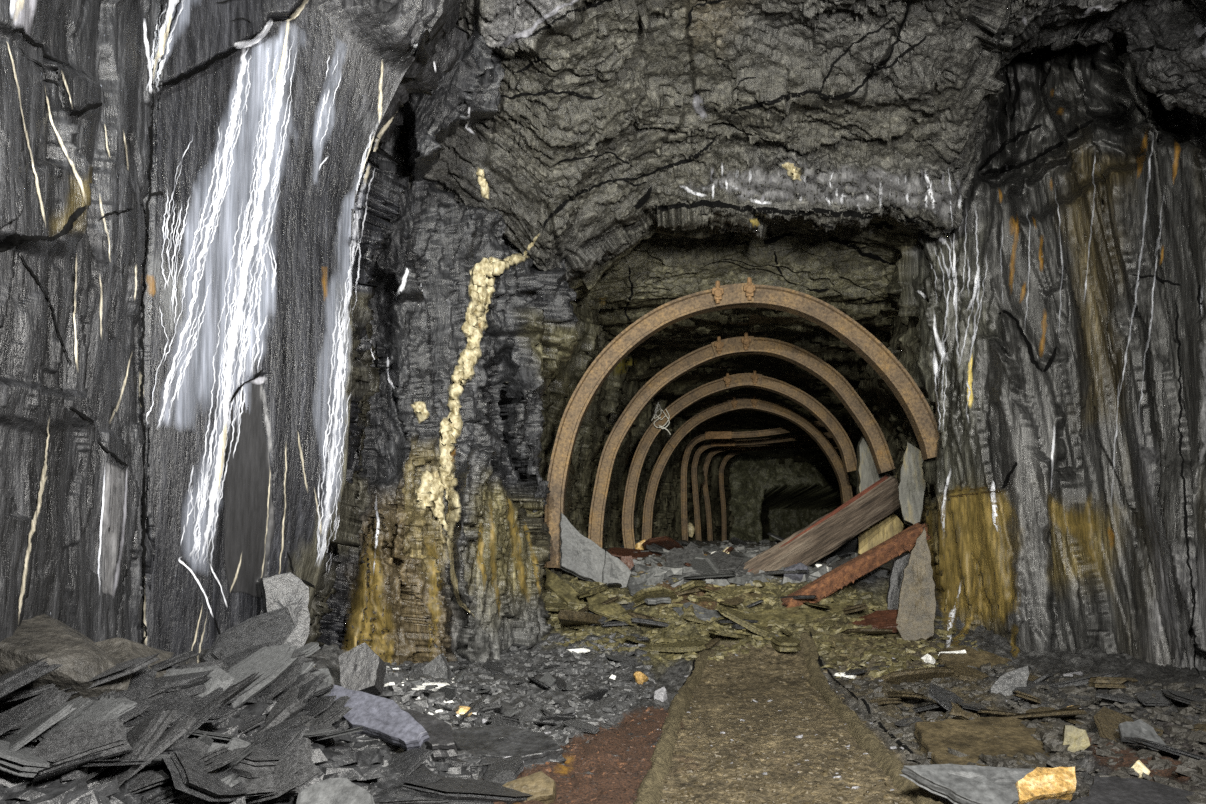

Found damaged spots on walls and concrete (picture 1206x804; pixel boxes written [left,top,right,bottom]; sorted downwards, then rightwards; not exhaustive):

leakage [314,49,341,169]
crack [500,0,613,99]
crack [543,0,927,293]
crack [0,0,301,644]
leakage [143,0,308,614]
leakage [317,63,394,571]
leakage [391,268,409,298]
leakage [344,504,394,672]
leakage [426,542,443,649]
leakage [477,499,541,612]
leakage [923,474,1020,657]
leakage [1050,428,1095,562]